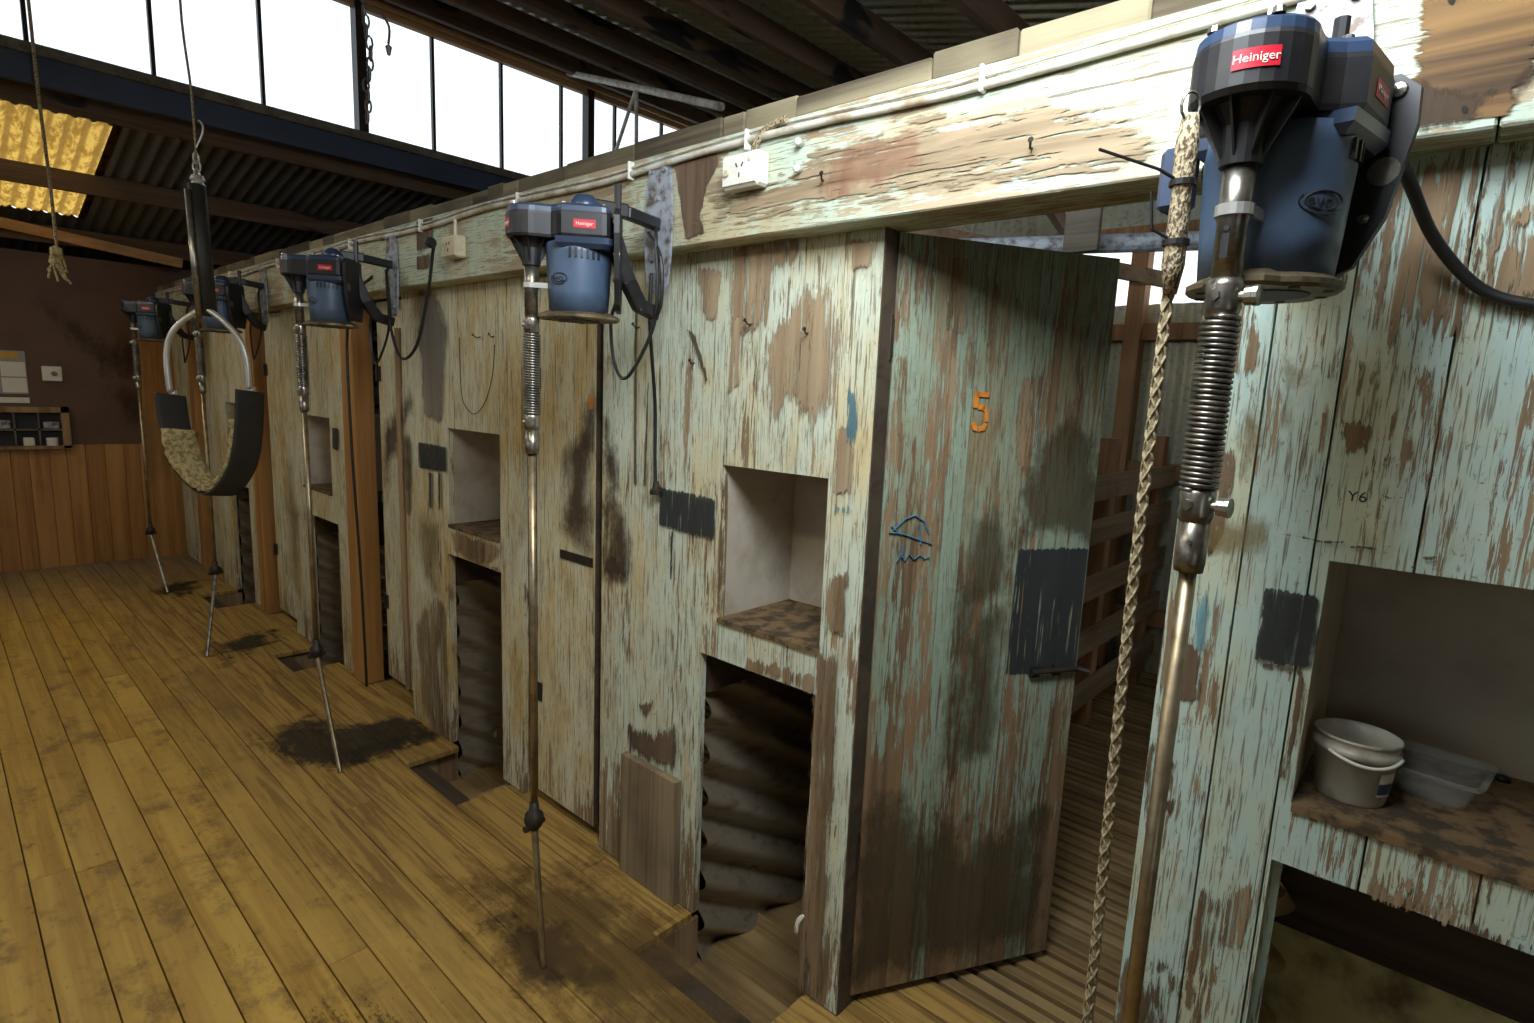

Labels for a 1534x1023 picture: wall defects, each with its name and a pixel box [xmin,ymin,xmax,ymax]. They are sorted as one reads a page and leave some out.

peeling [1411,0,1534,119]
peeling [674,78,1160,495]
peeling [1232,303,1266,408]
peeling [1340,141,1534,518]
peeling [911,247,1033,599]
peeling [1207,446,1237,556]
peeling [416,597,450,740]
peeling [1180,644,1202,702]
peeling [1260,663,1305,778]
peeling [1113,873,1264,1023]
peeling [1372,875,1532,954]